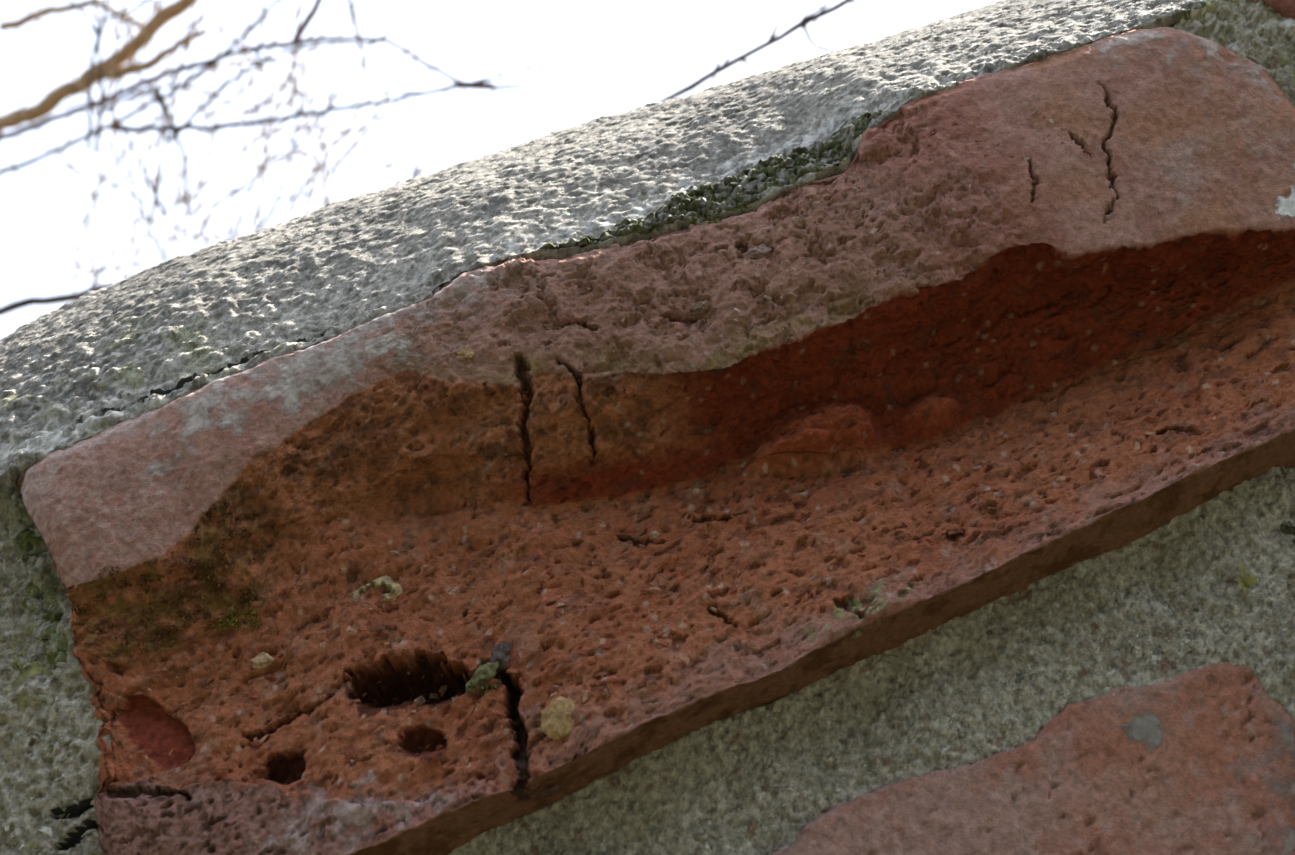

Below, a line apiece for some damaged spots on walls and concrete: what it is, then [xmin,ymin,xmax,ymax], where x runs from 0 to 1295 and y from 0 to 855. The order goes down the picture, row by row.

crack [1029,160,1042,203]
crack [1102,86,1122,216]
water stain [1275,186,1295,217]
crack [517,352,598,502]
spalling [69,229,1295,809]